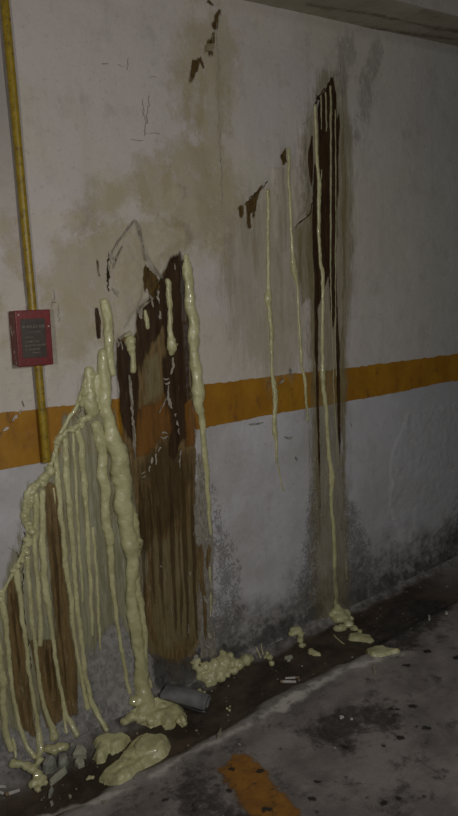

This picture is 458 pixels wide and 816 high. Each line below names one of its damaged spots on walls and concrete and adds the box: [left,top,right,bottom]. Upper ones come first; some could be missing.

corrosion [143,265,160,298]
water stain [165,278,178,356]
water stain [182,254,212,535]
water stain [264,189,284,491]
water stain [287,147,309,422]
corrosion [308,77,341,476]
water stain [306,85,458,651]
corrosion [7,482,78,737]
spalling [0,614,135,758]
water stain [0,298,299,793]
corrosion [196,538,217,659]